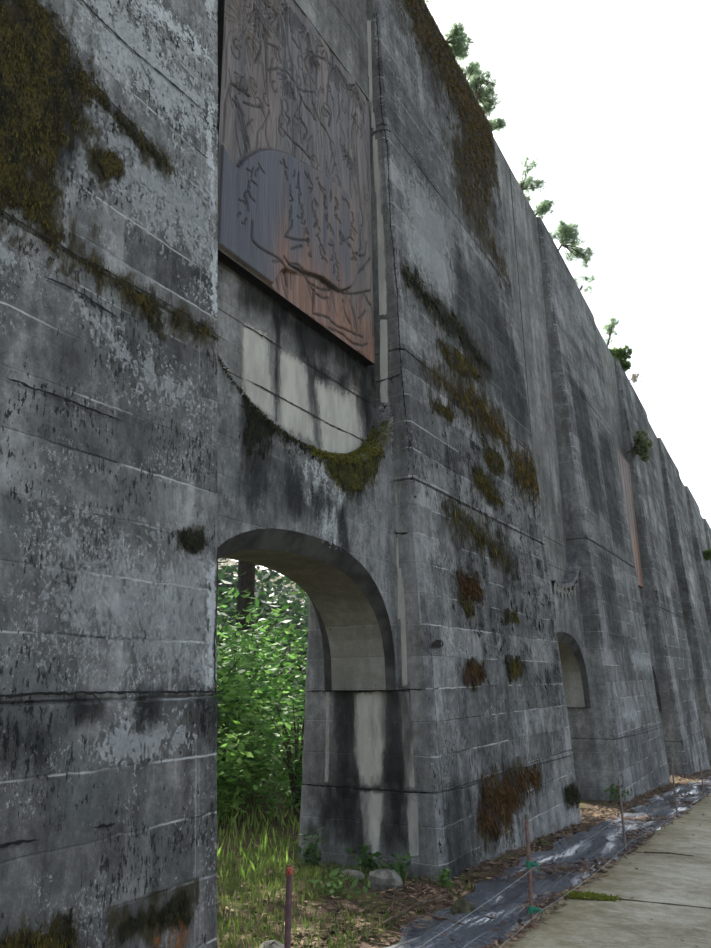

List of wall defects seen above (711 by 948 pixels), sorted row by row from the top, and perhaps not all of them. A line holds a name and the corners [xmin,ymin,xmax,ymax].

water stain [50,44,125,206]
water stain [0,128,218,358]
crack [0,209,226,341]
water stain [241,20,388,454]
crack [244,0,512,441]
crack [6,377,121,421]
crack [0,547,228,710]
water stain [319,539,419,857]
crack [0,839,37,849]